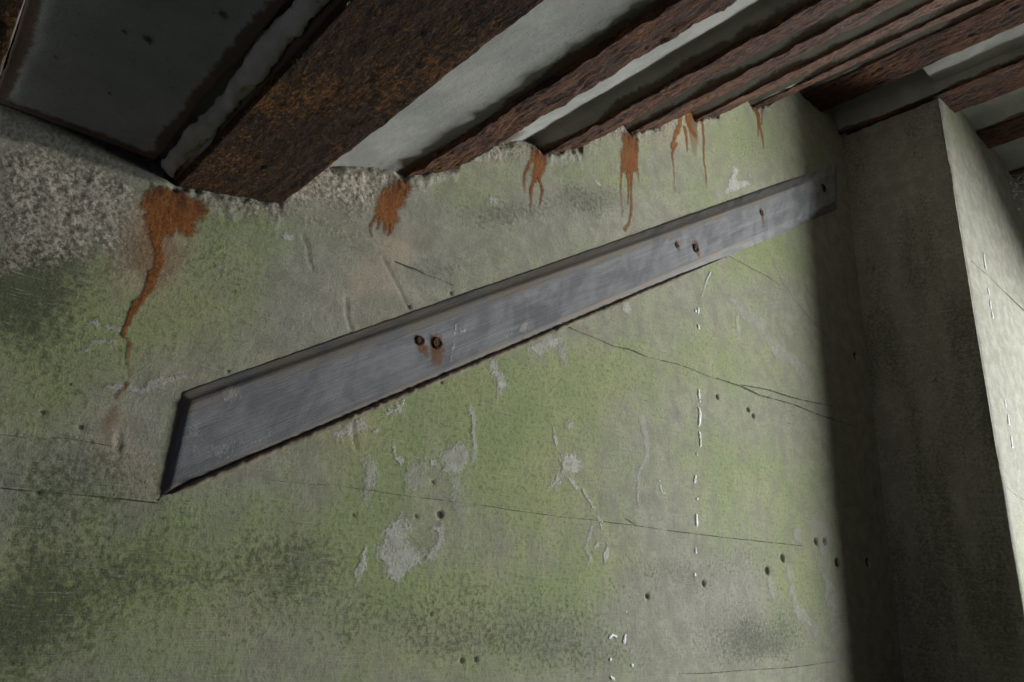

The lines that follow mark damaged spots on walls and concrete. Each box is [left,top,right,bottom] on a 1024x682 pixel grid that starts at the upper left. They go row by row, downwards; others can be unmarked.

corrosion [370,178,413,237]
corrosion [524,147,548,207]
corrosion [620,132,639,231]
corrosion [671,112,707,183]
corrosion [117,183,210,399]
crack [568,327,850,425]
crack [57,493,158,504]
peeling [431,408,477,474]
peeling [548,452,582,488]
peeling [354,511,445,583]